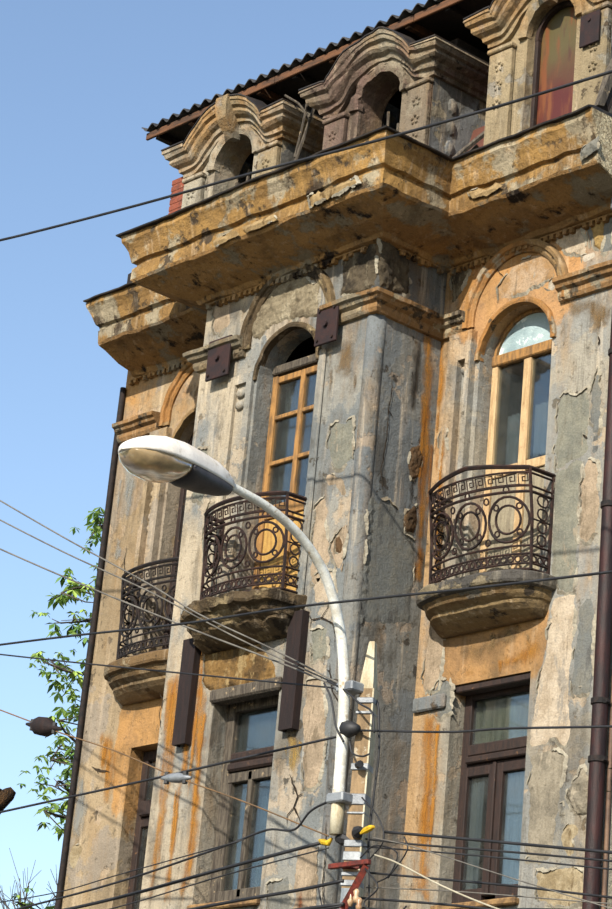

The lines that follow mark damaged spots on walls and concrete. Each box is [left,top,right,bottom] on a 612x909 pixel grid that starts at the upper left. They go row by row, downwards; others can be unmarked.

peeling [307,175,361,208]
peeling [467,182,503,198]
peeling [556,217,612,263]
crack [378,385,393,495]
corrosion [418,337,444,567]
peeling [310,415,356,608]
crack [309,601,353,712]
peeling [525,366,605,909]
corrosion [153,793,179,882]
corrosion [161,653,206,890]
crack [287,774,302,822]
corrosion [419,716,439,898]